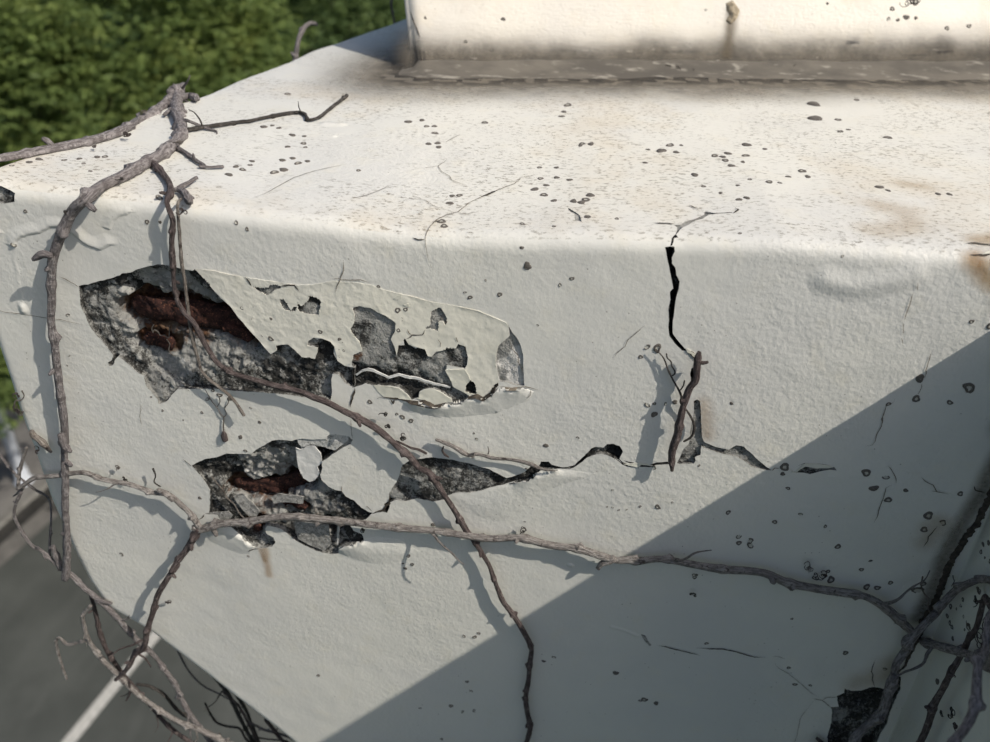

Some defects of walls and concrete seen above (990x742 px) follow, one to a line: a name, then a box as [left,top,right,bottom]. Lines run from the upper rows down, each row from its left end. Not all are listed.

spalling [0,186,15,204]
spalling [79,264,524,405]
crack [613,222,695,380]
spalling [192,400,770,554]
spalling [827,677,901,742]